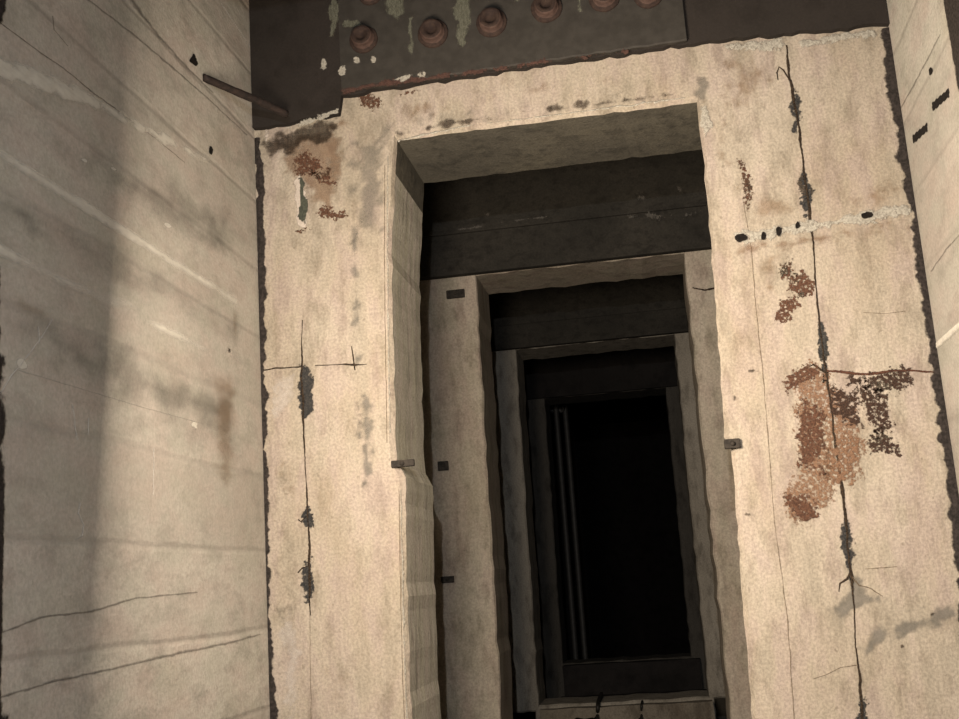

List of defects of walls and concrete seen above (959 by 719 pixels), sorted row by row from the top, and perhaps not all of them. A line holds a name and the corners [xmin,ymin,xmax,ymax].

rust [293,151,337,186]
rust [316,205,348,221]
rust [775,262,815,324]
crack [263,320,366,615]
crack [743,45,933,719]
rust [782,359,914,523]